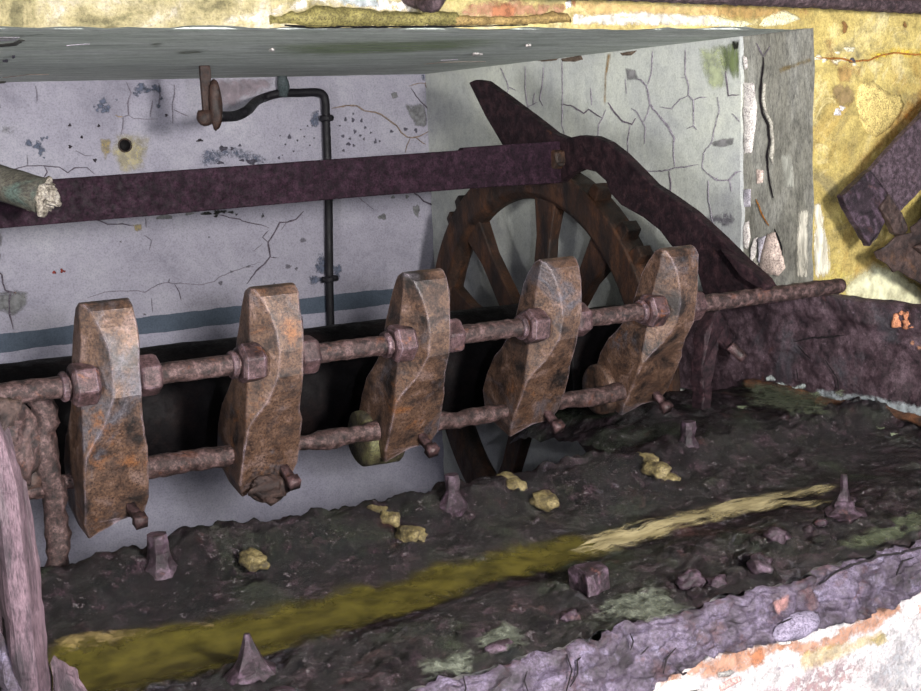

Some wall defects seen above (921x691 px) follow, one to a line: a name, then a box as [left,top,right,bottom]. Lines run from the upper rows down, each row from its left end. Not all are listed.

crack [816,52,921,62]
crack [116,82,187,134]
crack [411,50,742,224]
peeling [712,82,757,153]
crack [756,43,774,198]
crack [88,211,304,312]
crack [0,273,16,330]
rust [891,310,914,330]
rust [663,597,900,683]
peeling [657,678,701,691]
flaking render [716,670,741,691]